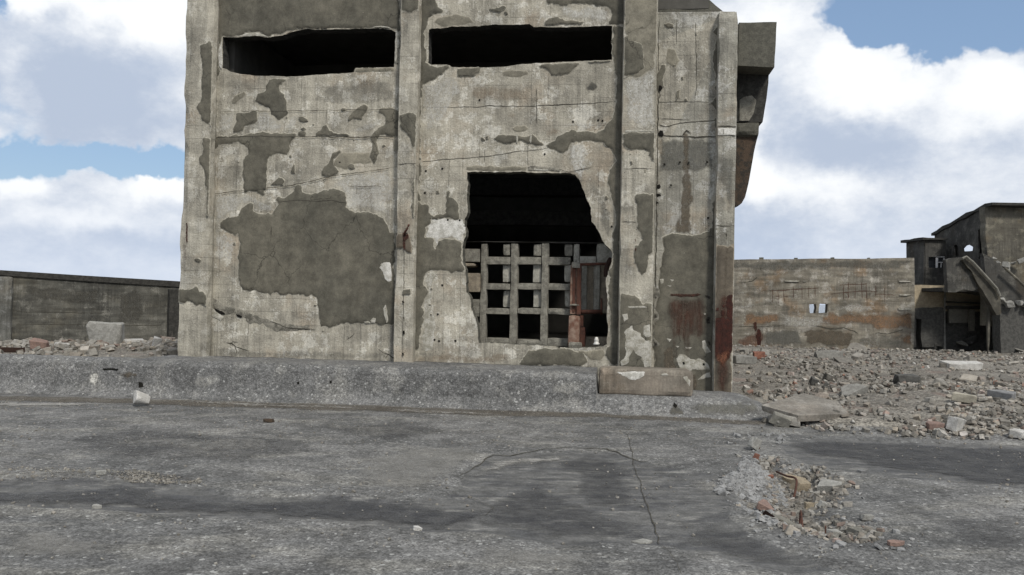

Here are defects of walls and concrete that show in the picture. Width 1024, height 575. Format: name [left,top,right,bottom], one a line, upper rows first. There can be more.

crack [429,89,607,120]
peeling [196,0,481,356]
peeling [481,0,736,392]
damp [661,134,733,232]
peeling [179,285,207,307]
corrosion [715,294,761,391]
crack [605,426,681,572]